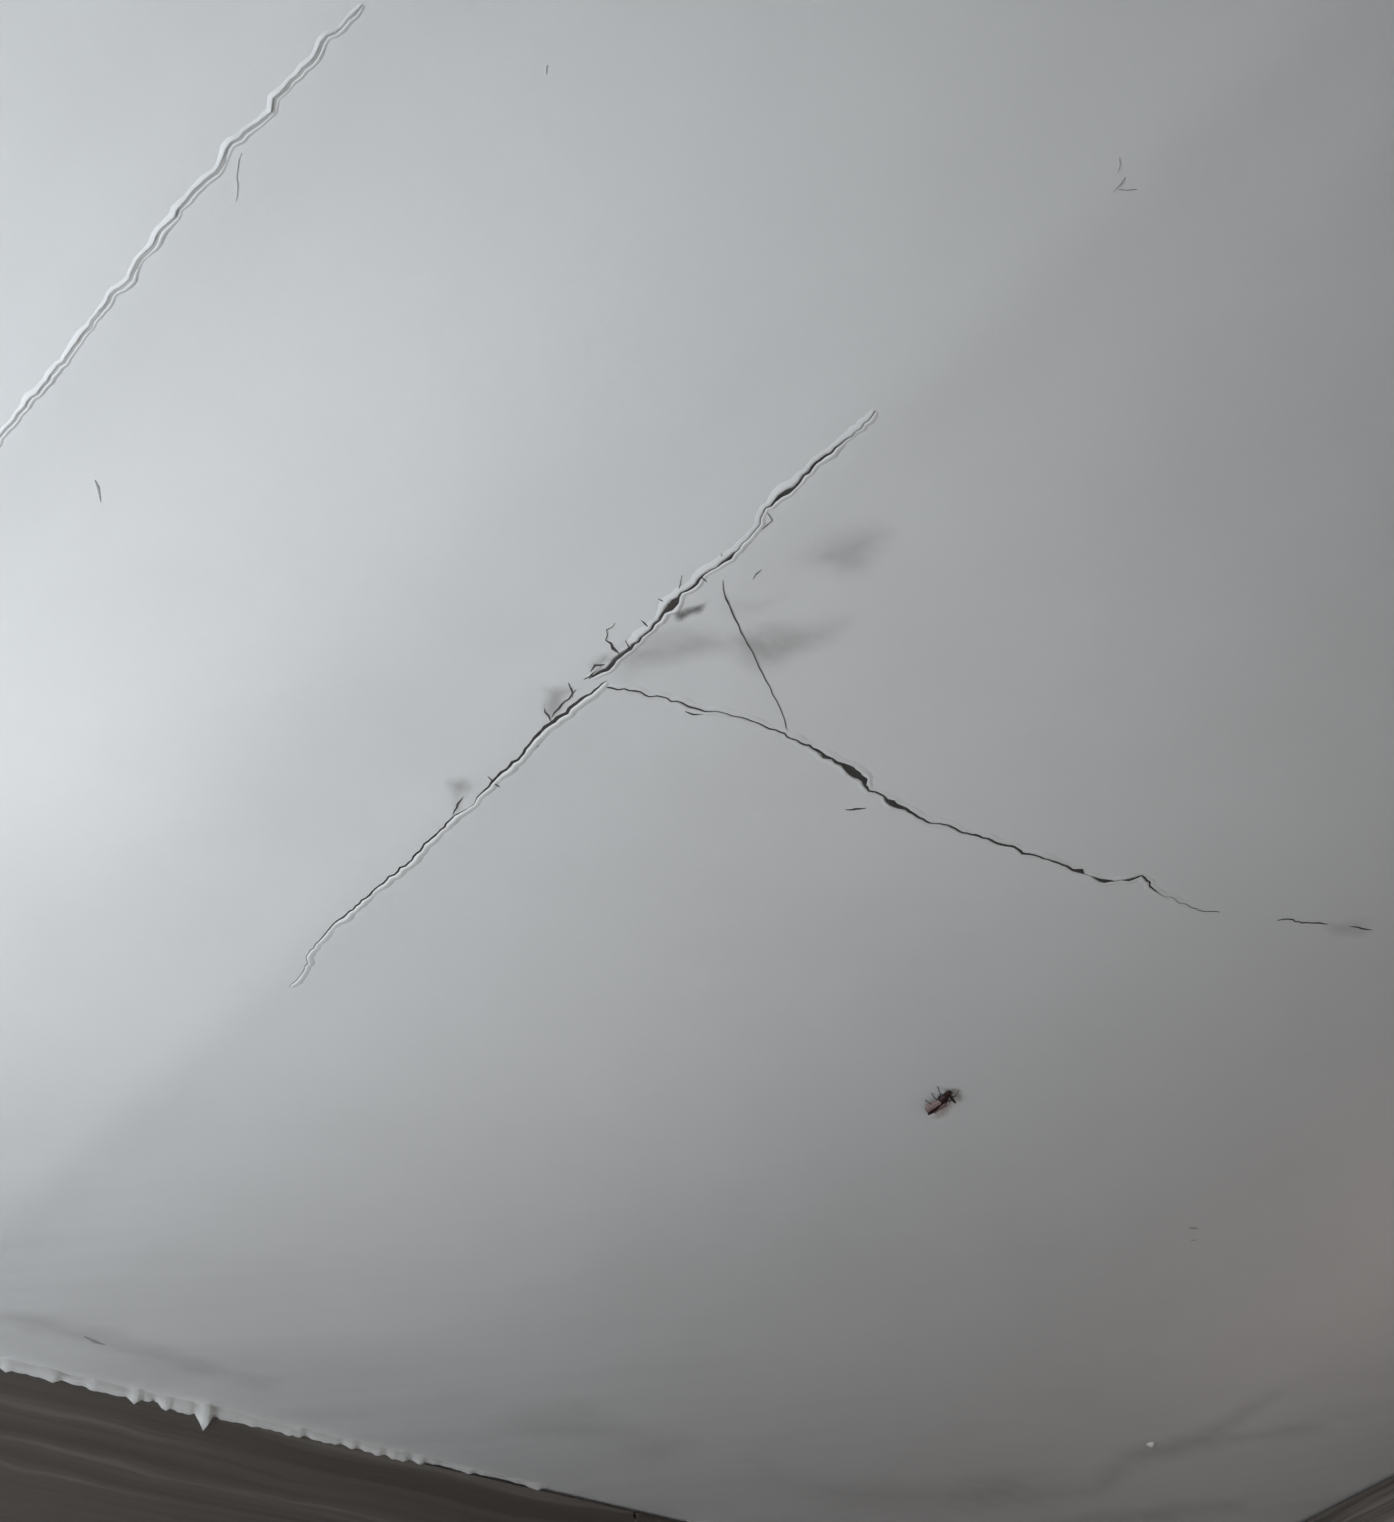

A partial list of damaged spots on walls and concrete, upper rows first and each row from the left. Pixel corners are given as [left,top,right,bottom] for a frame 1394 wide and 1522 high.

crack [0,3,365,447]
crack [289,410,1222,988]
crack [1277,919,1371,930]